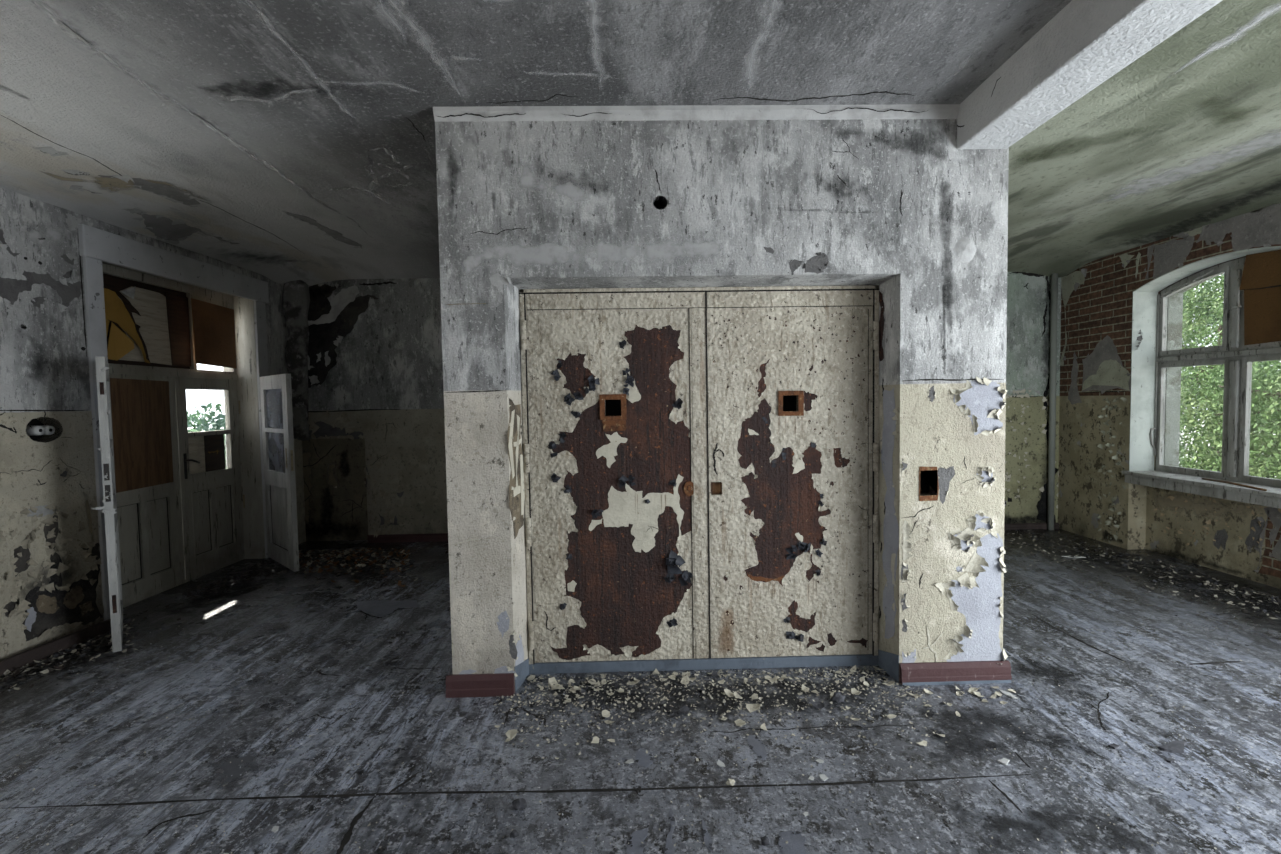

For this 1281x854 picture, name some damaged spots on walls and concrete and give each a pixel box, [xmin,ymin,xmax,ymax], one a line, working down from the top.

damp [208,84,329,97]
damp [875,134,934,153]
damp [1113,134,1281,199]
damp [942,185,950,235]
damp [1132,183,1281,243]
spalling [0,229,82,313]
spalling [788,252,829,275]
damp [943,258,952,325]
spalling [307,283,379,388]
peeling [0,410,117,641]
peeling [881,388,912,639]
peeling [934,509,1008,665]